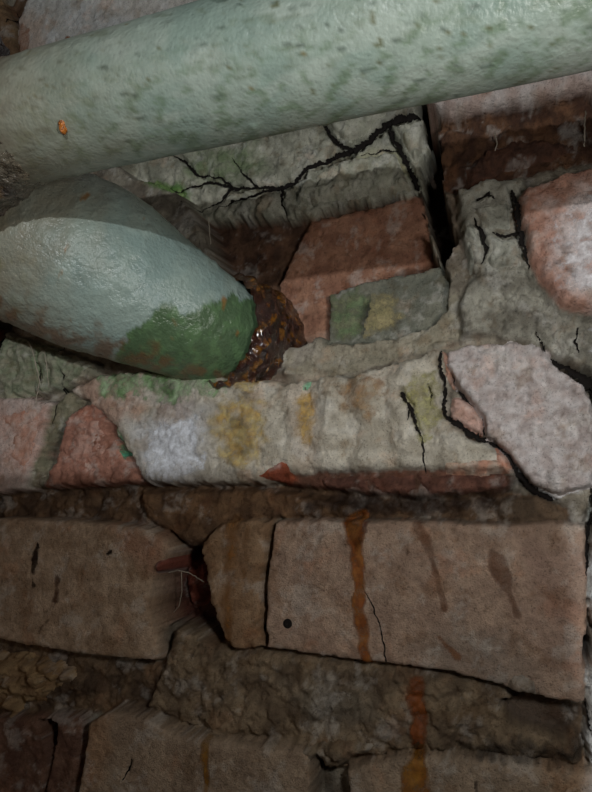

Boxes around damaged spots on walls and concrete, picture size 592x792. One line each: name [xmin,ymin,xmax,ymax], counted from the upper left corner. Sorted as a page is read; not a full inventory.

crack [174,113,432,216]
crack [474,190,530,269]
crack [535,328,592,396]
crack [400,351,553,501]
rust [344,510,373,663]
rust [401,677,430,792]